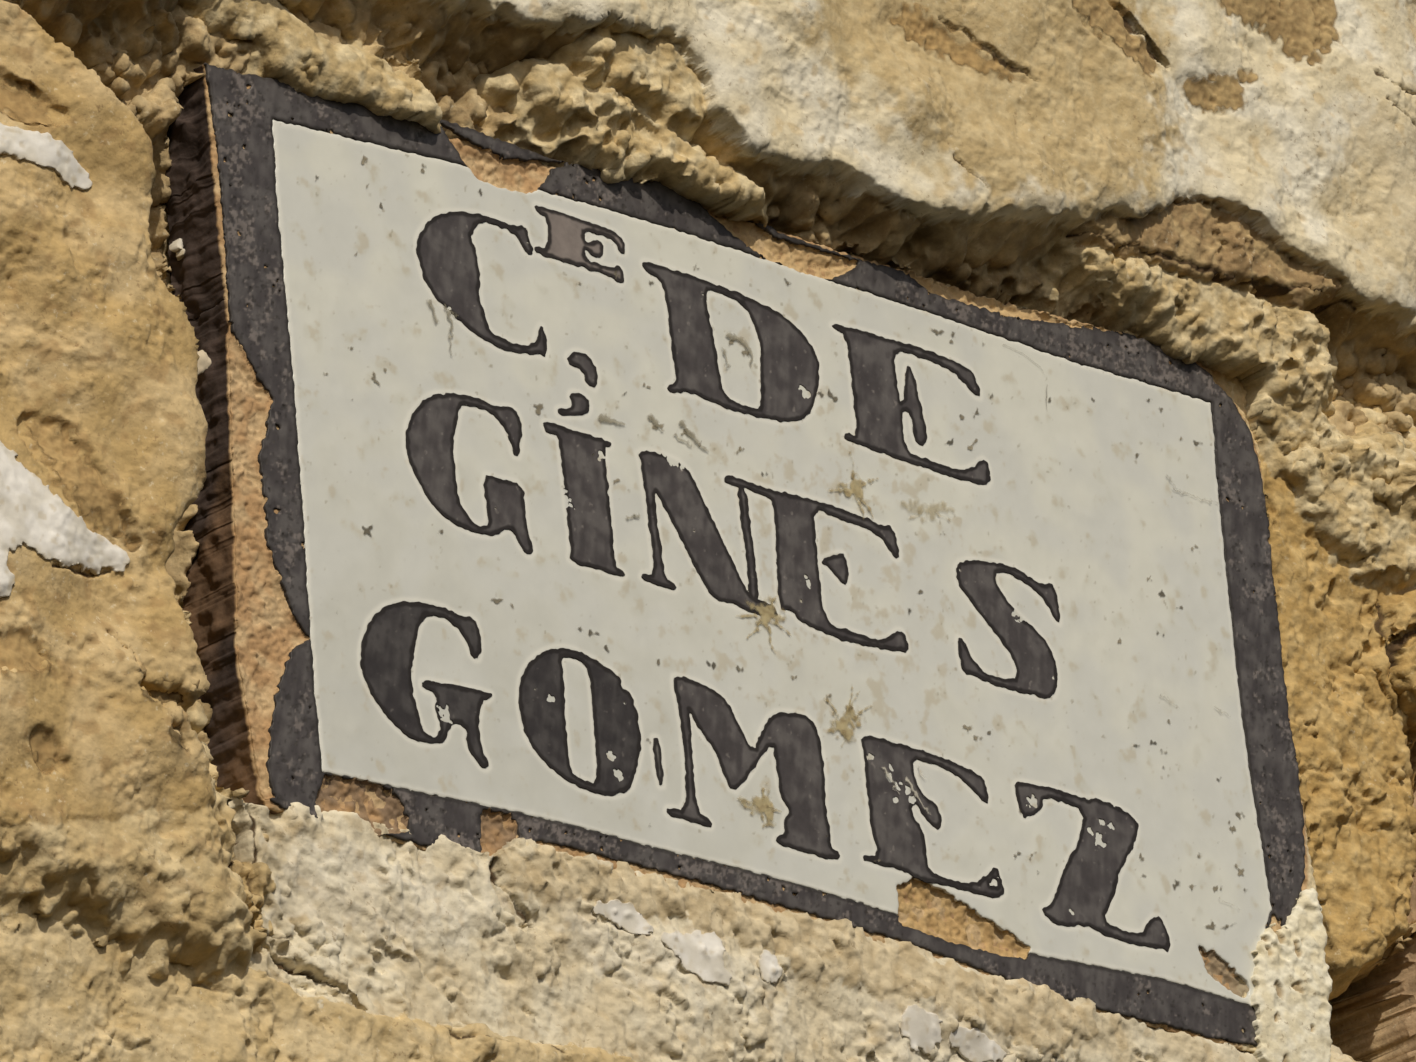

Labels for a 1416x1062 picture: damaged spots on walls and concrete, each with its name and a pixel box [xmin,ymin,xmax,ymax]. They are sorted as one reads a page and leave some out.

crack [943,23,1024,73]
crack [1114,9,1158,62]
peeling [449,138,556,195]
peeling [480,808,518,856]
peeling [896,878,1030,960]
peeling [1198,947,1249,998]